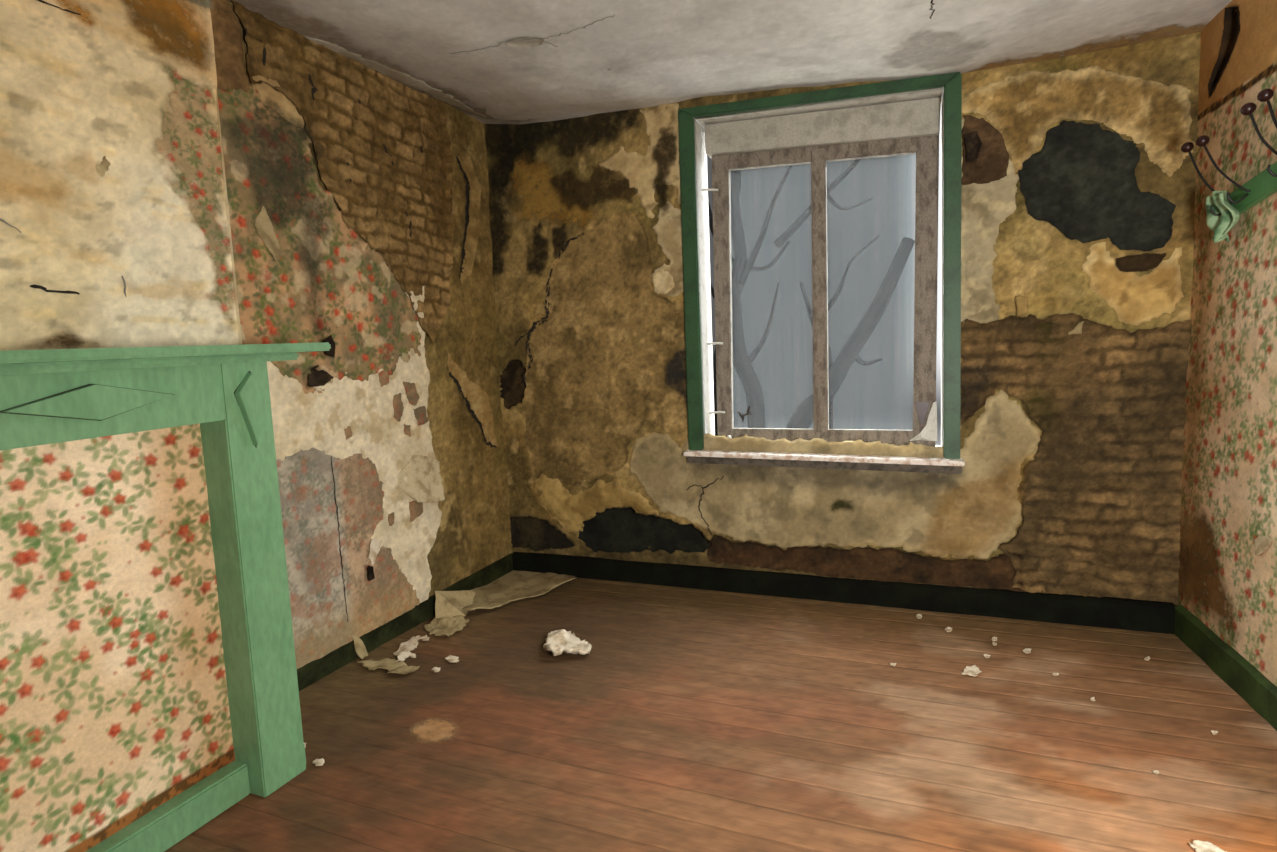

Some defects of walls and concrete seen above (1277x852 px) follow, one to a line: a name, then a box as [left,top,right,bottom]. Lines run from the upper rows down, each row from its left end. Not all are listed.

spalling [96,156,111,177]
damp [485,108,640,275]
damp [653,128,676,208]
spalling [30,284,80,295]
flaking render [210,0,486,606]
spalling [447,103,688,485]
flaking render [707,66,1195,606]